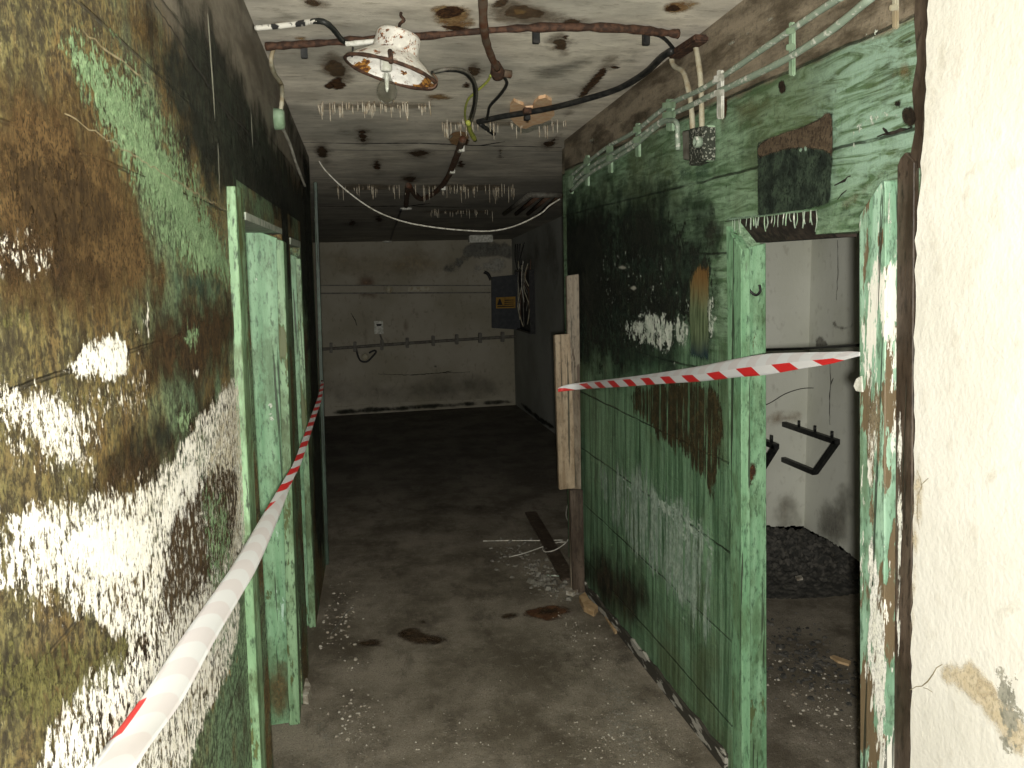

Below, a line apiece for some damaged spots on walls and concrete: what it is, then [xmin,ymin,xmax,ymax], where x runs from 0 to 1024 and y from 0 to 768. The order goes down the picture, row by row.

damp [757,113,833,216]
damp [0,85,234,500]
peeling [619,251,689,363]
damp [631,381,723,499]
damp [92,453,238,729]
damp [398,621,442,644]
peeling [866,382,903,761]
spalling [943,663,1024,753]